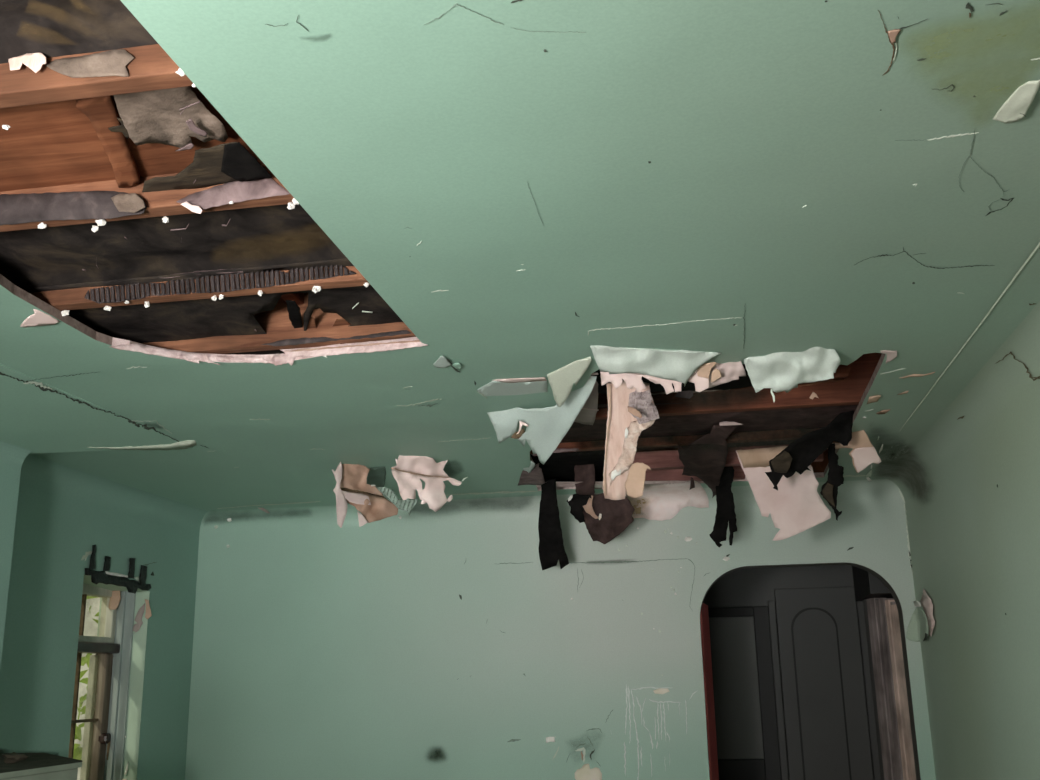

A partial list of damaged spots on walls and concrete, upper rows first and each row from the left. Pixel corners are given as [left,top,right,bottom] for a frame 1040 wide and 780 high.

crack [424,0,585,33]
crack [878,10,927,75]
peeling [993,80,1040,124]
crack [895,130,1014,216]
peeling [20,309,60,328]
flaking render [110,338,428,366]
crack [0,372,210,452]
peeling [477,345,840,487]
peeling [827,395,891,482]
peeling [332,455,468,528]
flaking render [626,481,709,521]
peeling [736,446,831,541]